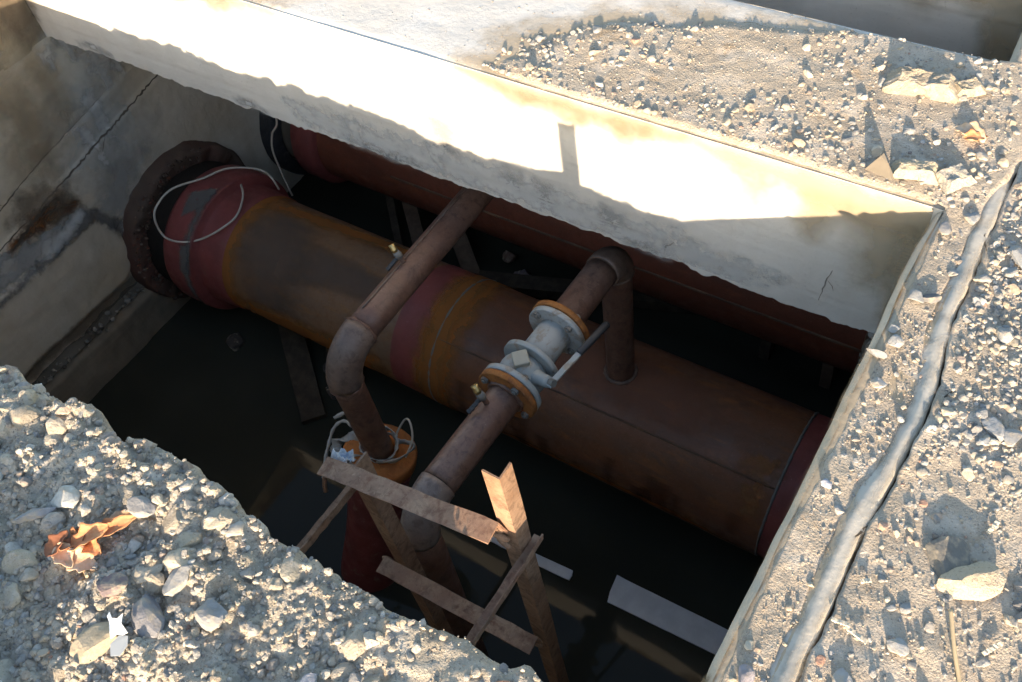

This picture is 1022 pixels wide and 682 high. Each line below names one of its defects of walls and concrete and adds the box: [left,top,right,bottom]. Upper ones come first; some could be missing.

leakage [479,76,679,139]
rust [7,197,79,255]
leakage [241,215,378,310]
leakage [284,98,751,281]
leakage [712,150,932,306]
spalling [854,332,875,372]